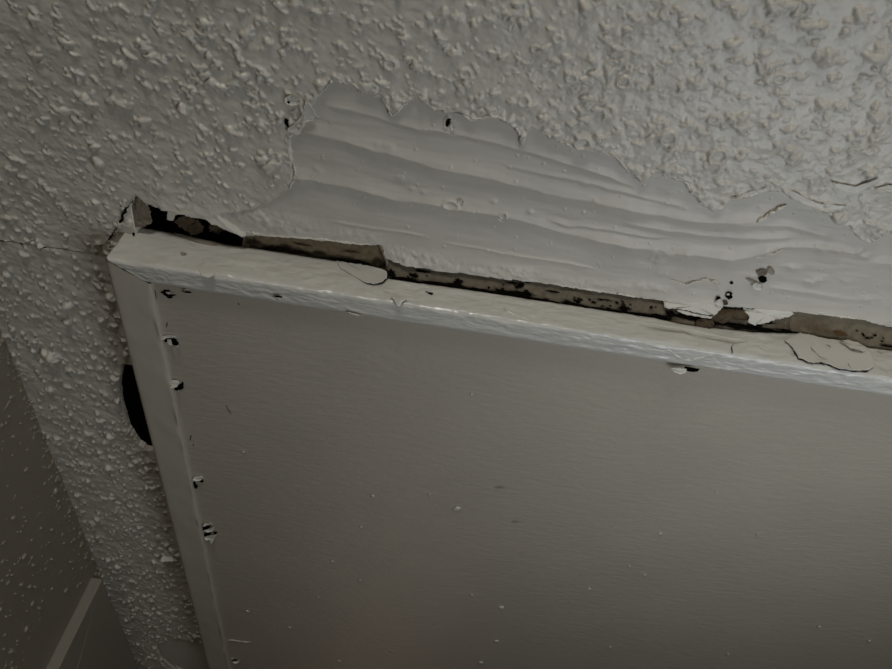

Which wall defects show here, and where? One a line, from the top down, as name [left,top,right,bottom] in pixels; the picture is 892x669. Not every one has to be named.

peeling [337,261,387,284]
crack [106,195,892,372]
leakage [246,238,799,333]
peeling [663,282,733,319]
spalling [747,267,775,290]
peeling [743,308,795,326]
peeling [784,332,892,371]
crack [119,364,152,446]